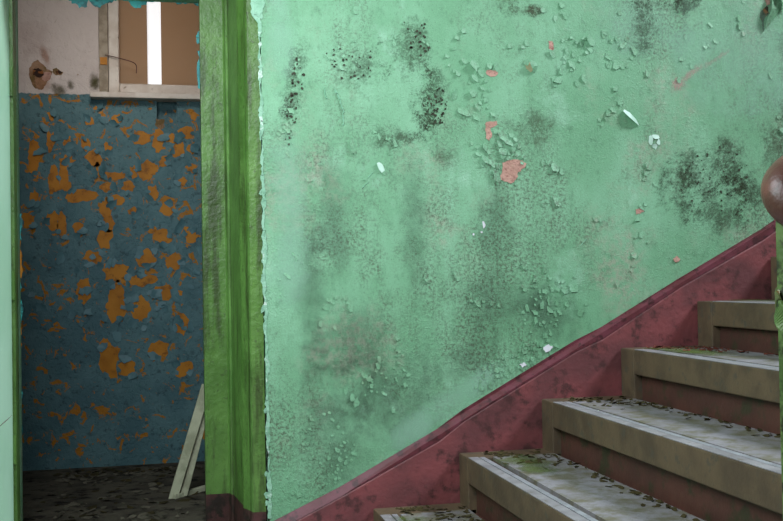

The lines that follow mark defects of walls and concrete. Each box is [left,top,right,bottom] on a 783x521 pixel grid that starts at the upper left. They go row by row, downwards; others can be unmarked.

spalling [29,60,63,90]
peeling [82,102,129,128]
peeling [277,57,305,158]
peeling [325,39,372,79]
peeling [403,22,430,56]
peeling [423,28,529,186]
peeling [549,30,639,87]
peeling [21,108,203,380]
peeling [475,258,589,392]
peeling [344,335,411,407]